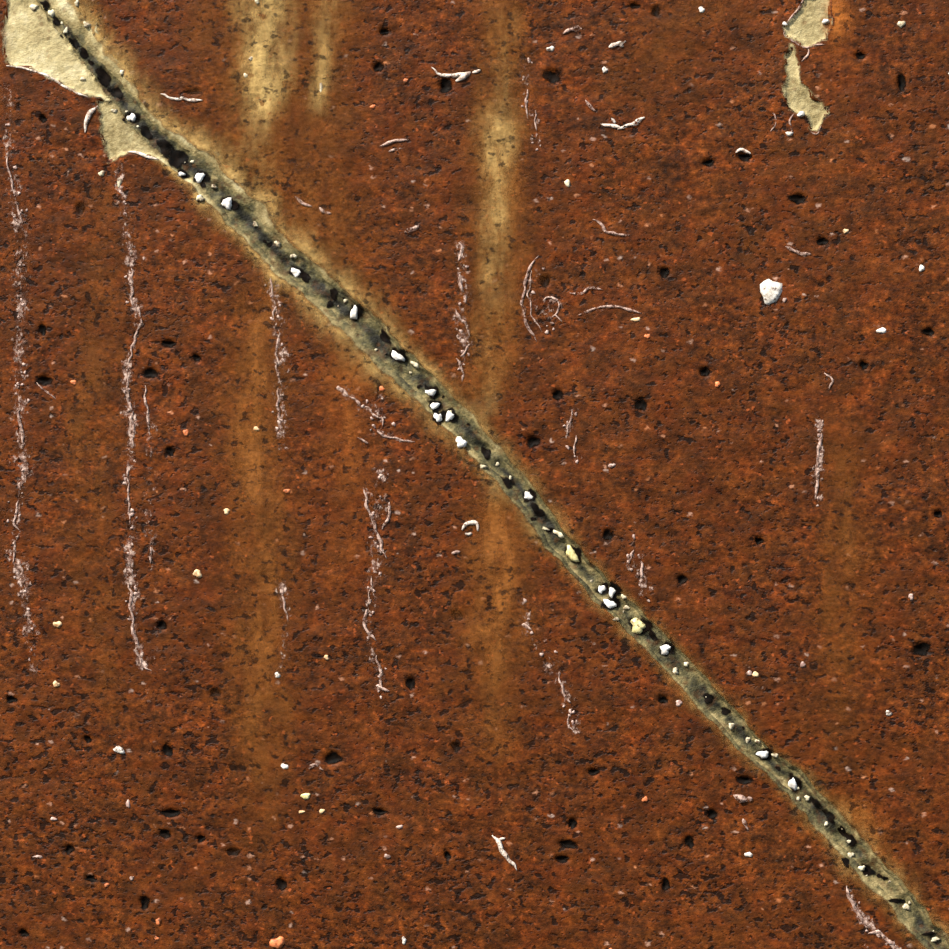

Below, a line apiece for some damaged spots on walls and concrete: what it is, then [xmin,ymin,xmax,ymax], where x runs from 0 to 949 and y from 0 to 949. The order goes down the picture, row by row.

peeling [2,0,162,161]
peeling [771,0,829,136]
corrosion [828,0,849,37]
leakage [121,345,134,398]
leakage [123,232,137,285]
crack [37,0,617,608]
leakage [121,410,137,483]
corrosion [227,290,288,748]
leakage [6,550,40,633]
leakage [124,539,148,670]
corrosion [467,497,526,739]
crack [600,582,949,949]